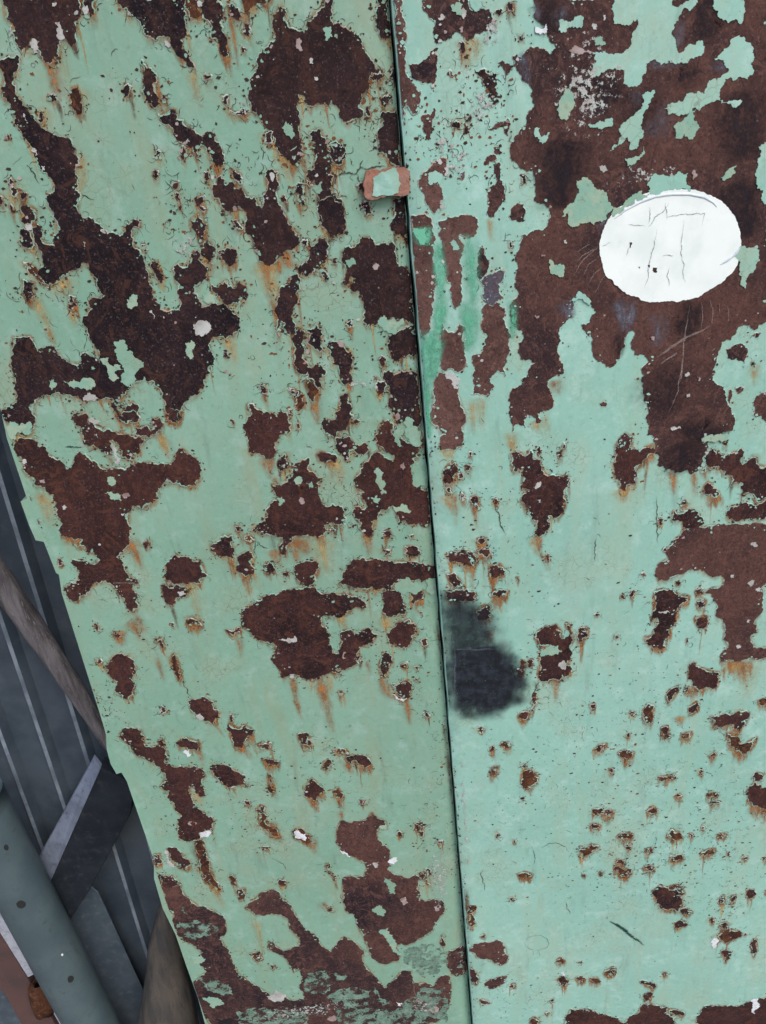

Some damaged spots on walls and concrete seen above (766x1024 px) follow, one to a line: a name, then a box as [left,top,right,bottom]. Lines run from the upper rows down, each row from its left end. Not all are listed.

peeling [494,2,515,16]
peeling [451,116,472,135]
peeling [488,117,511,136]
peeling [484,147,502,166]
rust [117,0,766,719]
peeling [685,588,709,643]
rust [105,653,136,701]
rust [187,696,255,752]
rust [709,710,758,760]
peeling [228,874,246,901]
rust [119,726,508,1024]
rust [651,884,685,913]